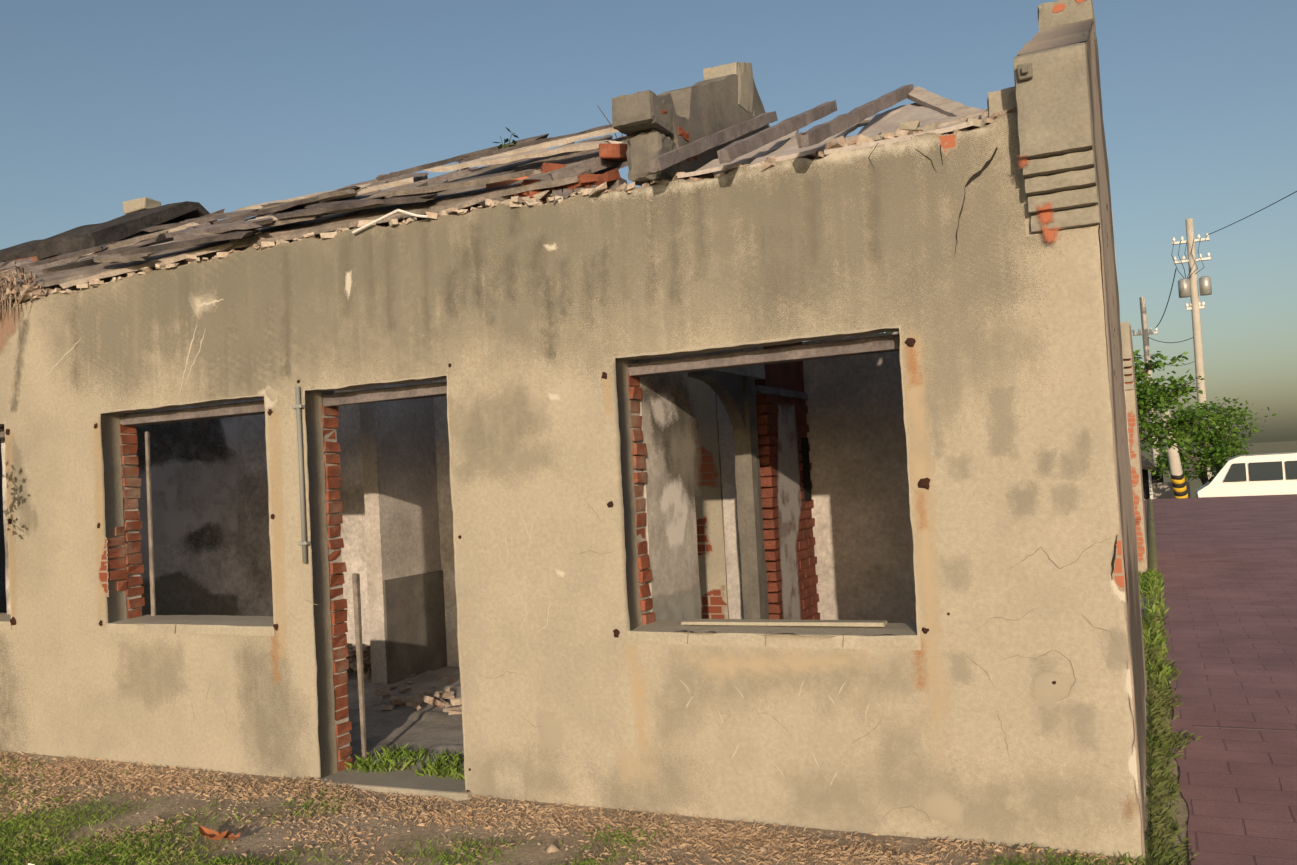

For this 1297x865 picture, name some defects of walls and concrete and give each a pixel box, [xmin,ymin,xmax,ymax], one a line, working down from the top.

peeling [589,124,996,202]
crack [915,133,998,256]
flaking render [1035,202,1061,244]
leakage [6,114,1096,539]
peeling [257,385,279,412]
leakage [466,22,1147,852]
peeling [98,418,241,616]
corrosion [901,327,955,766]
crack [1006,535,1130,647]
flaking render [1109,411,1145,603]
crack [967,650,1076,758]